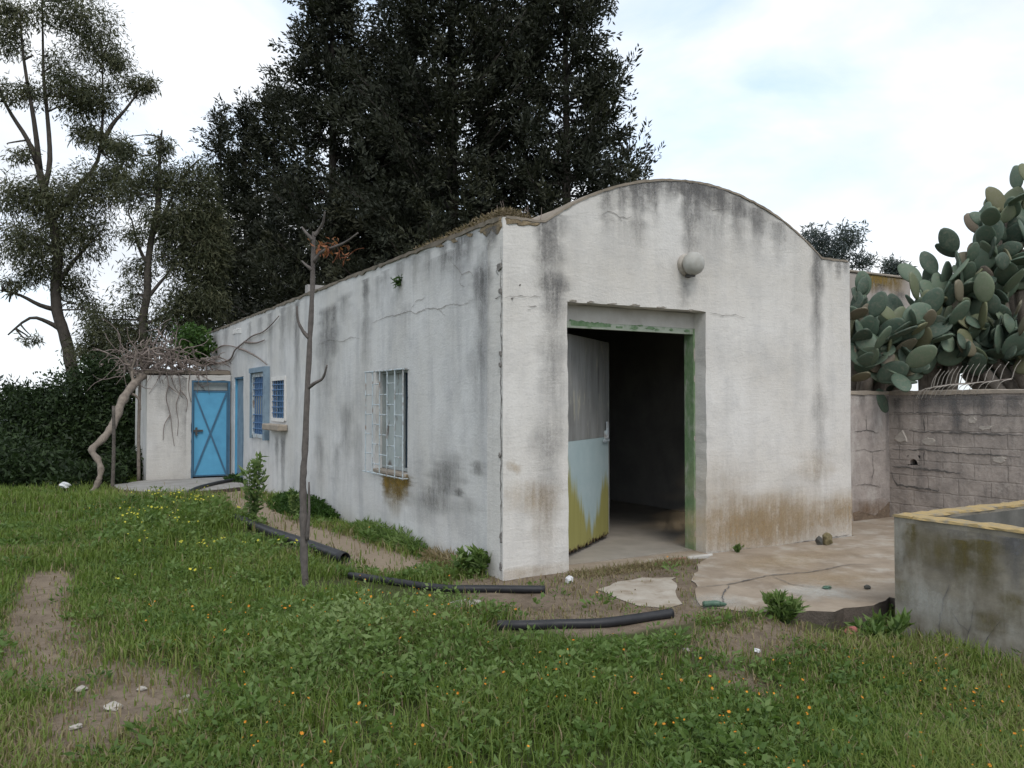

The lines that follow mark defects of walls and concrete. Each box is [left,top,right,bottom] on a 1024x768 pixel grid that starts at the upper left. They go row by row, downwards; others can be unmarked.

water stain [632,181,724,230]
spalling [436,217,541,248]
crack [318,256,539,540]
rust [382,474,408,499]
crack [692,564,849,602]